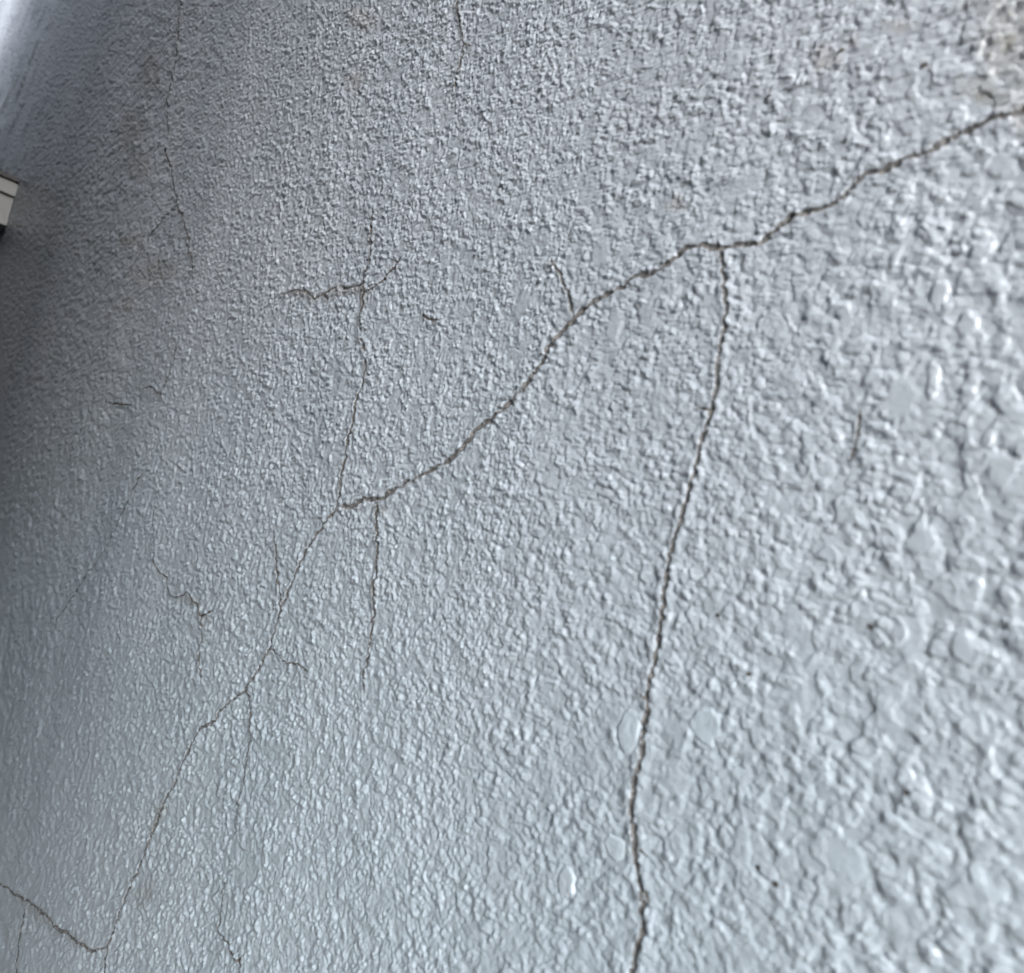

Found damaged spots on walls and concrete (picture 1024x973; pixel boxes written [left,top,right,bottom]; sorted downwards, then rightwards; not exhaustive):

crack [106,0,193,350]
crack [105,342,178,406]
crack [52,474,143,633]
crack [131,107,1024,973]
crack [0,883,132,973]